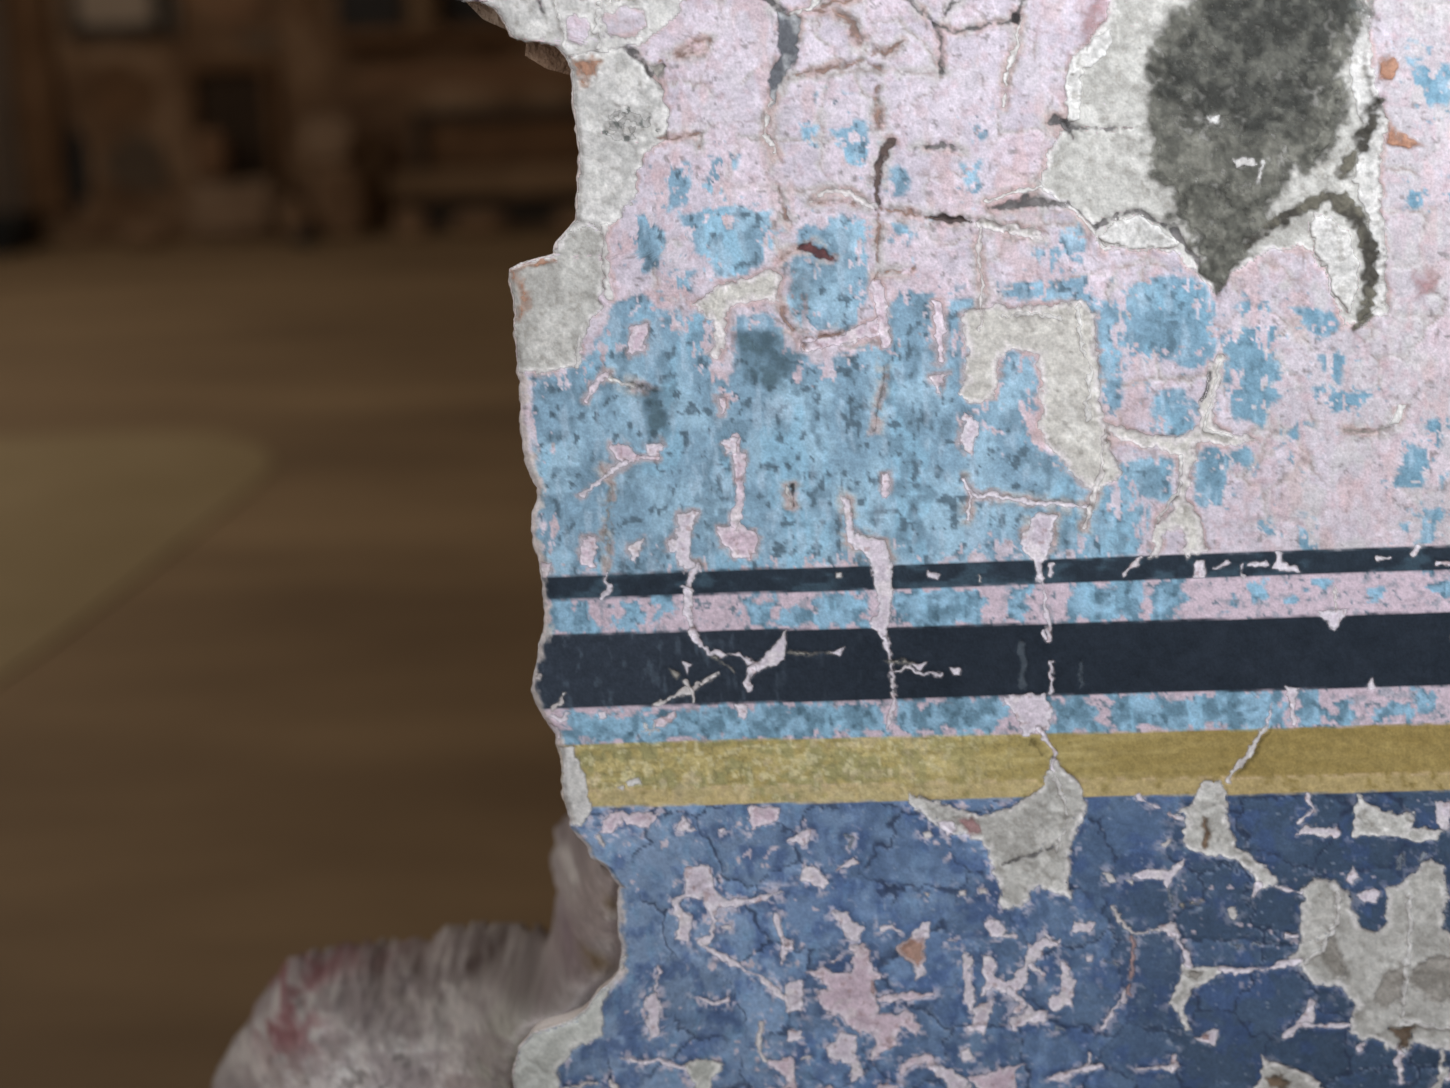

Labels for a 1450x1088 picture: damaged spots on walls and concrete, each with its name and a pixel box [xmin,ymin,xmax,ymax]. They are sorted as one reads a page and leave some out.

flaking render [348,0,682,374]
crack [762,0,1201,331]
damp [1146,0,1386,330]
peeling [717,433,758,560]
crack [653,562,844,706]
crack [841,496,960,729]
flaking render [929,299,1299,578]
spalling [211,693,658,1088]
peeling [671,864,934,1088]
flaking render [877,757,1095,1088]
flaking render [1103,780,1450,1052]
flaking render [1253,1055,1320,1088]